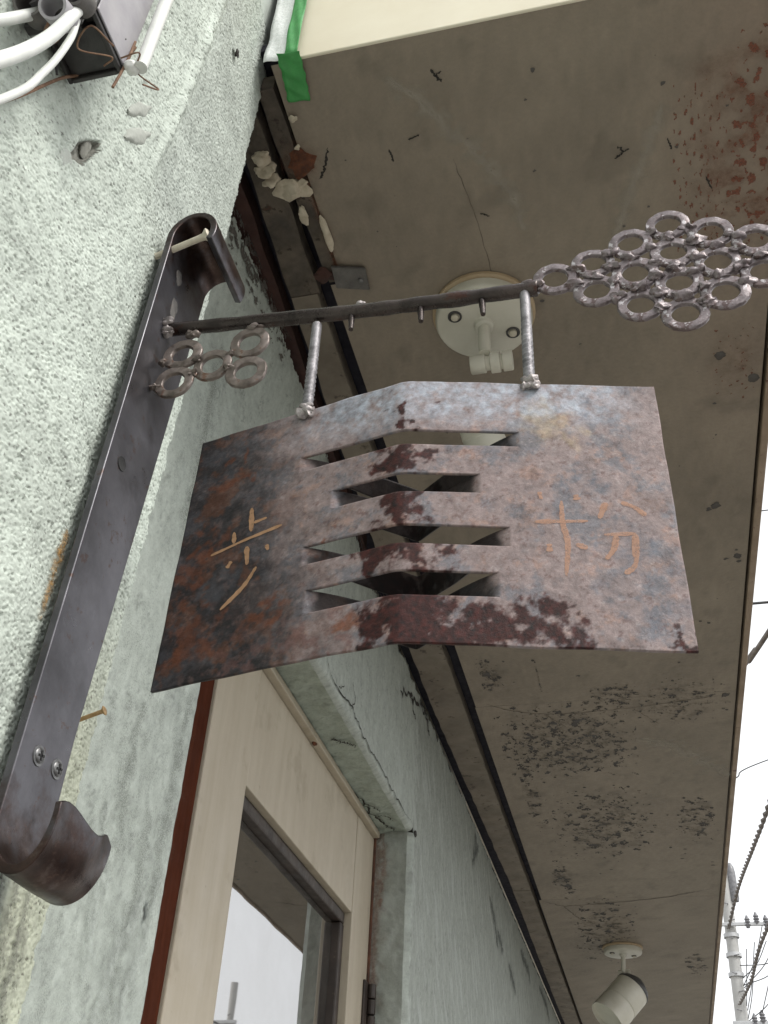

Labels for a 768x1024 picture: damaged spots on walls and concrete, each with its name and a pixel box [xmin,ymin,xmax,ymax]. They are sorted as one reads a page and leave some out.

spalling [60,140,101,166]
rust [673,23,768,244]
crack [327,658,412,832]